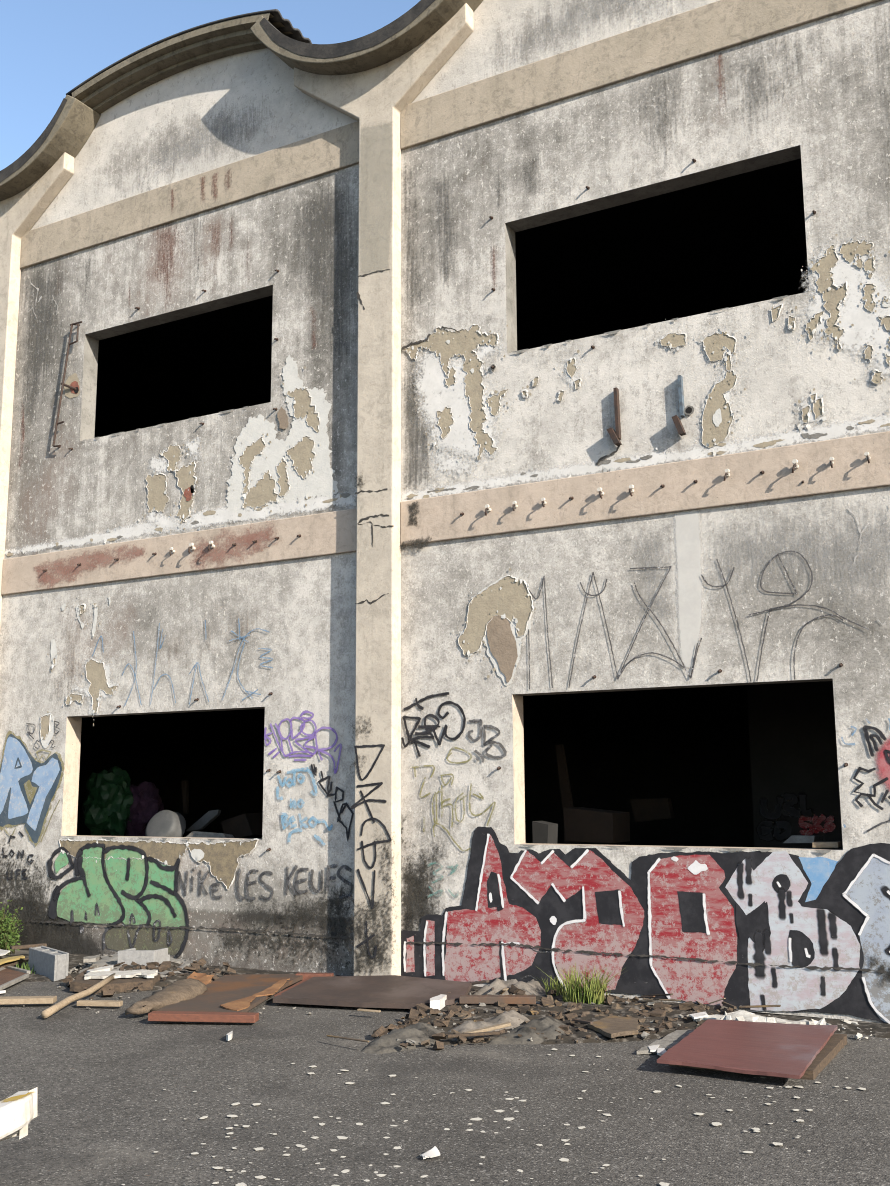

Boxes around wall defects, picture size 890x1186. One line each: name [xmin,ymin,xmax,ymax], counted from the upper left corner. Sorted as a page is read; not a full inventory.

peeling [771,234,890,391]
peeling [5,354,356,556]
peeling [401,307,890,502]
corrosion [36,546,145,588]
corrosion [193,527,274,566]
peeling [453,568,537,686]
leakage [0,838,100,955]
leakage [216,819,447,976]